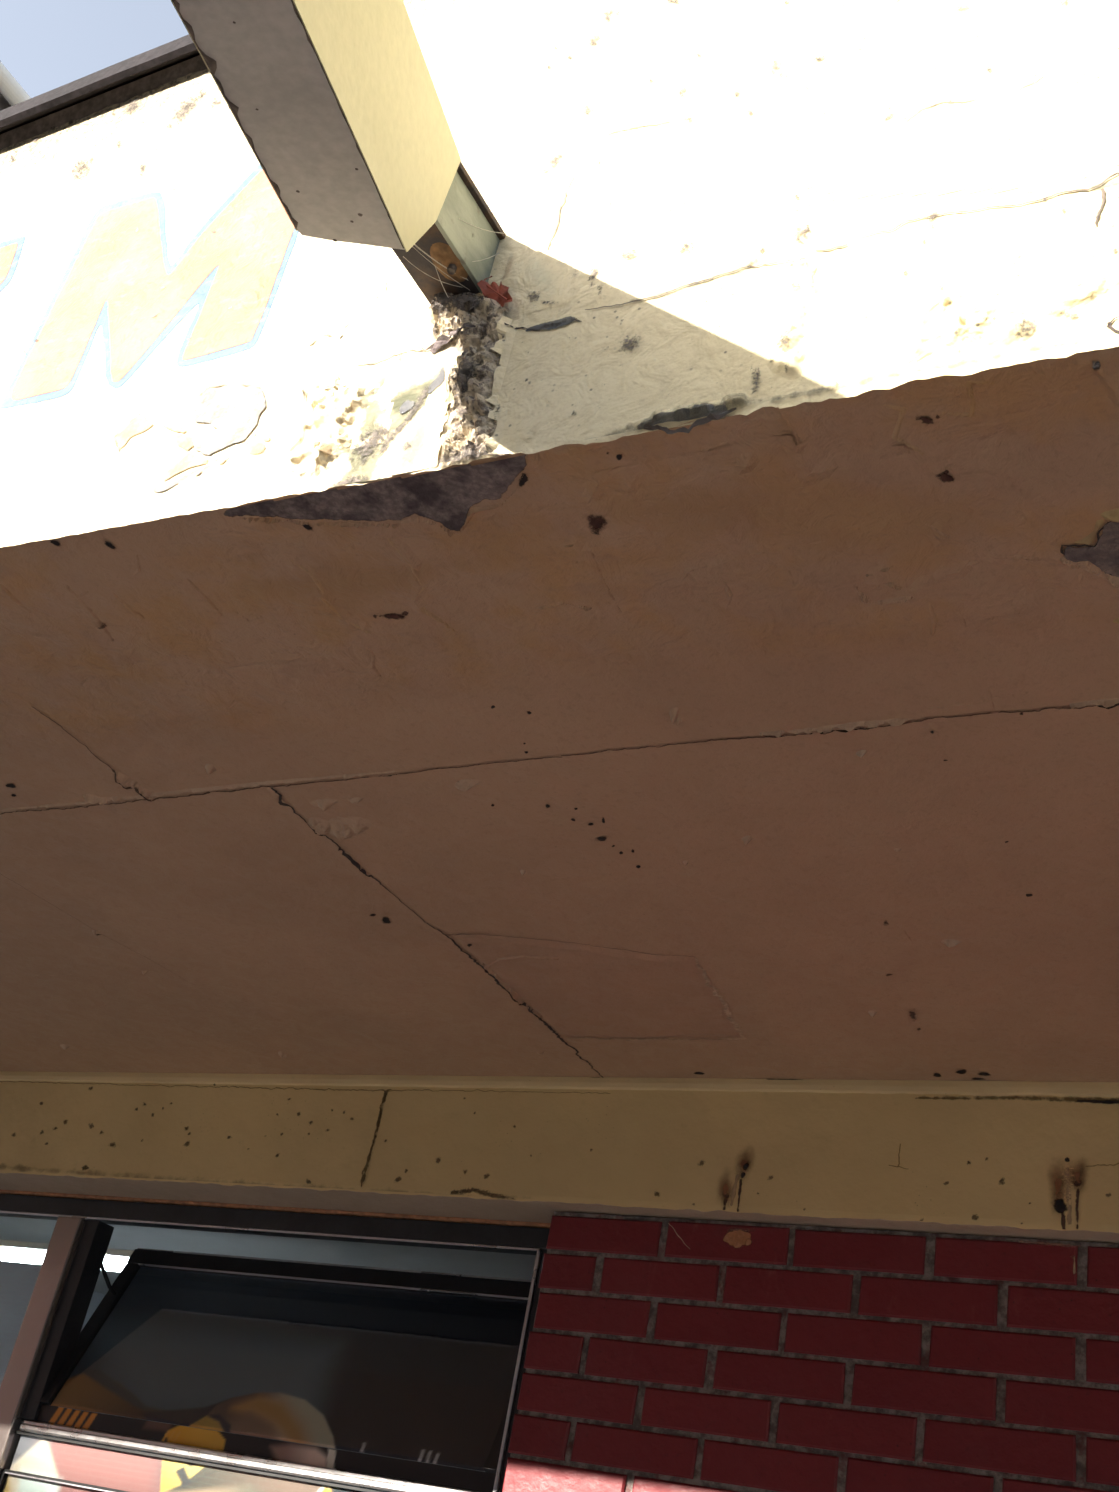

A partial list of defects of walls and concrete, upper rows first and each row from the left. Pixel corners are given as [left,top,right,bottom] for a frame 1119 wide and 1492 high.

crack [419,168,1119,353]
crack [284,279,387,401]
peeling [112,379,274,494]
spalling [224,455,528,537]
peeling [1060,509,1119,597]
crack [0,698,1119,1187]
corrosion [720,1154,750,1212]
corrosion [1052,1157,1084,1229]